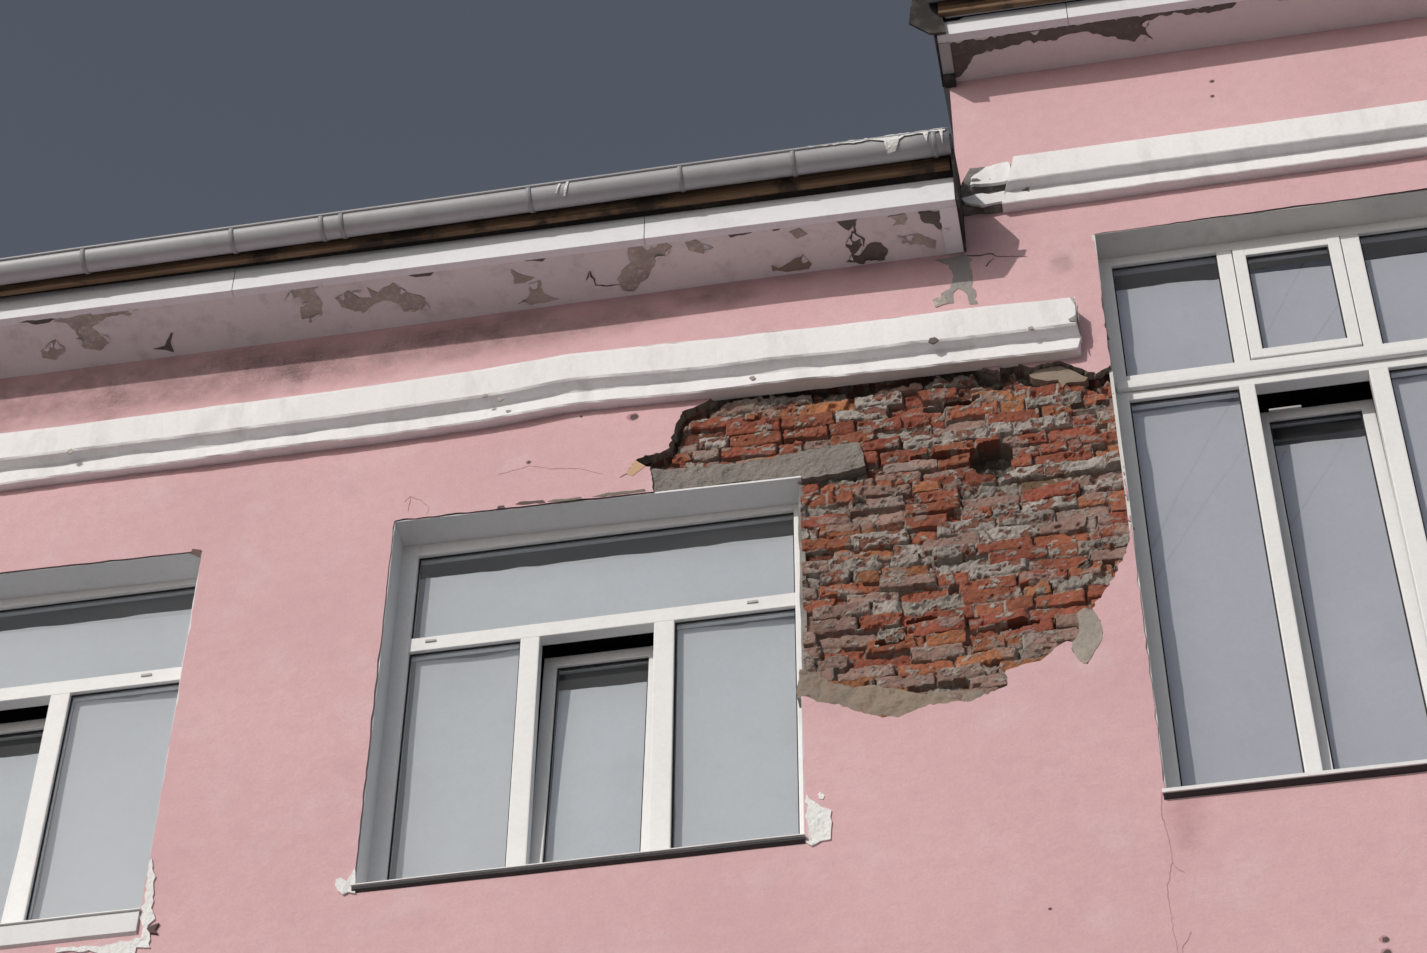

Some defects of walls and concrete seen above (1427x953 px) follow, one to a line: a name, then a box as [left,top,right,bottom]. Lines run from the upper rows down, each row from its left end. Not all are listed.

peeling [950,2,1236,78]
peeling [285,272,434,323]
peeling [511,258,559,305]
peeling [617,240,713,292]
peeling [771,228,812,272]
flaking render [836,211,978,308]
peeling [19,307,139,360]
peeling [153,333,174,352]
flaking render [497,366,1130,701]
crack [1161,792,1190,952]